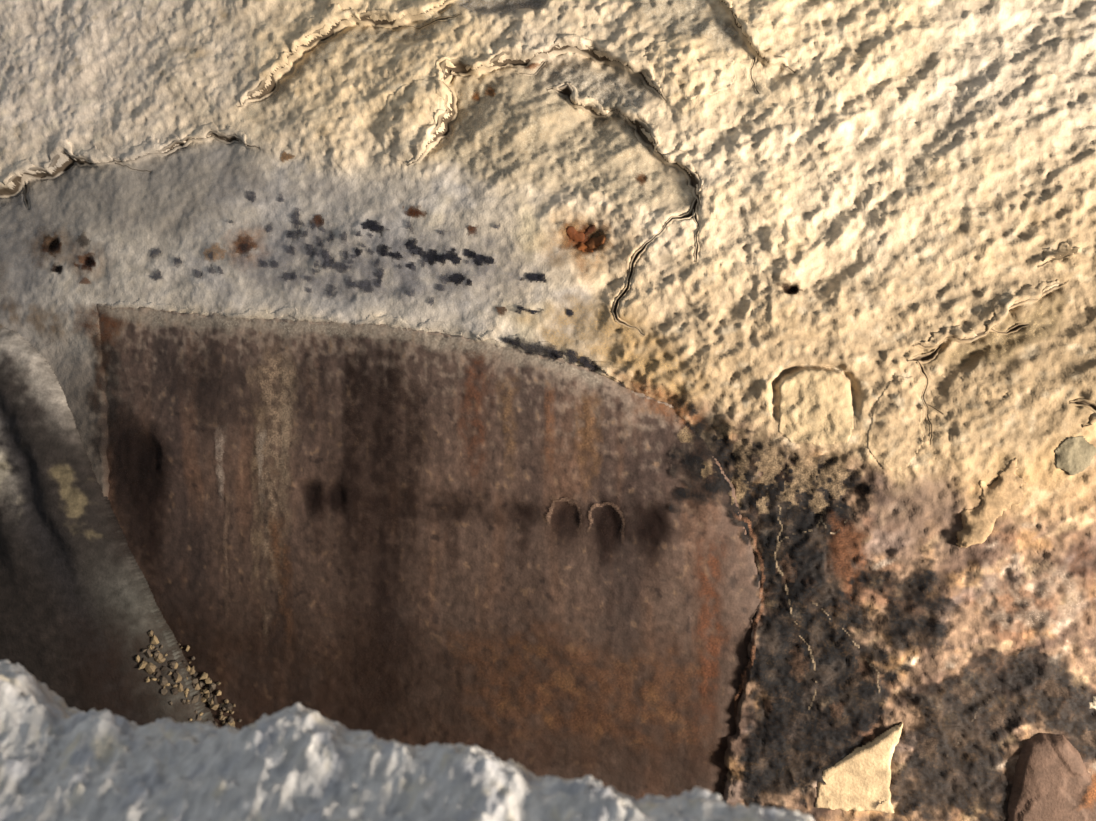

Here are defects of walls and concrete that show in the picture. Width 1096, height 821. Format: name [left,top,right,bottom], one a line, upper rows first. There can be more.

crack [237,0,460,109]
spalling [239,0,546,116]
spalling [408,34,704,206]
spalling [0,122,253,251]
crack [0,131,258,209]
crack [407,41,702,337]
corrosion [41,233,62,257]
corrosion [74,253,96,284]
mould [194,251,223,278]
mould [258,208,495,306]
mould [510,273,547,283]
corrosion [561,222,610,256]